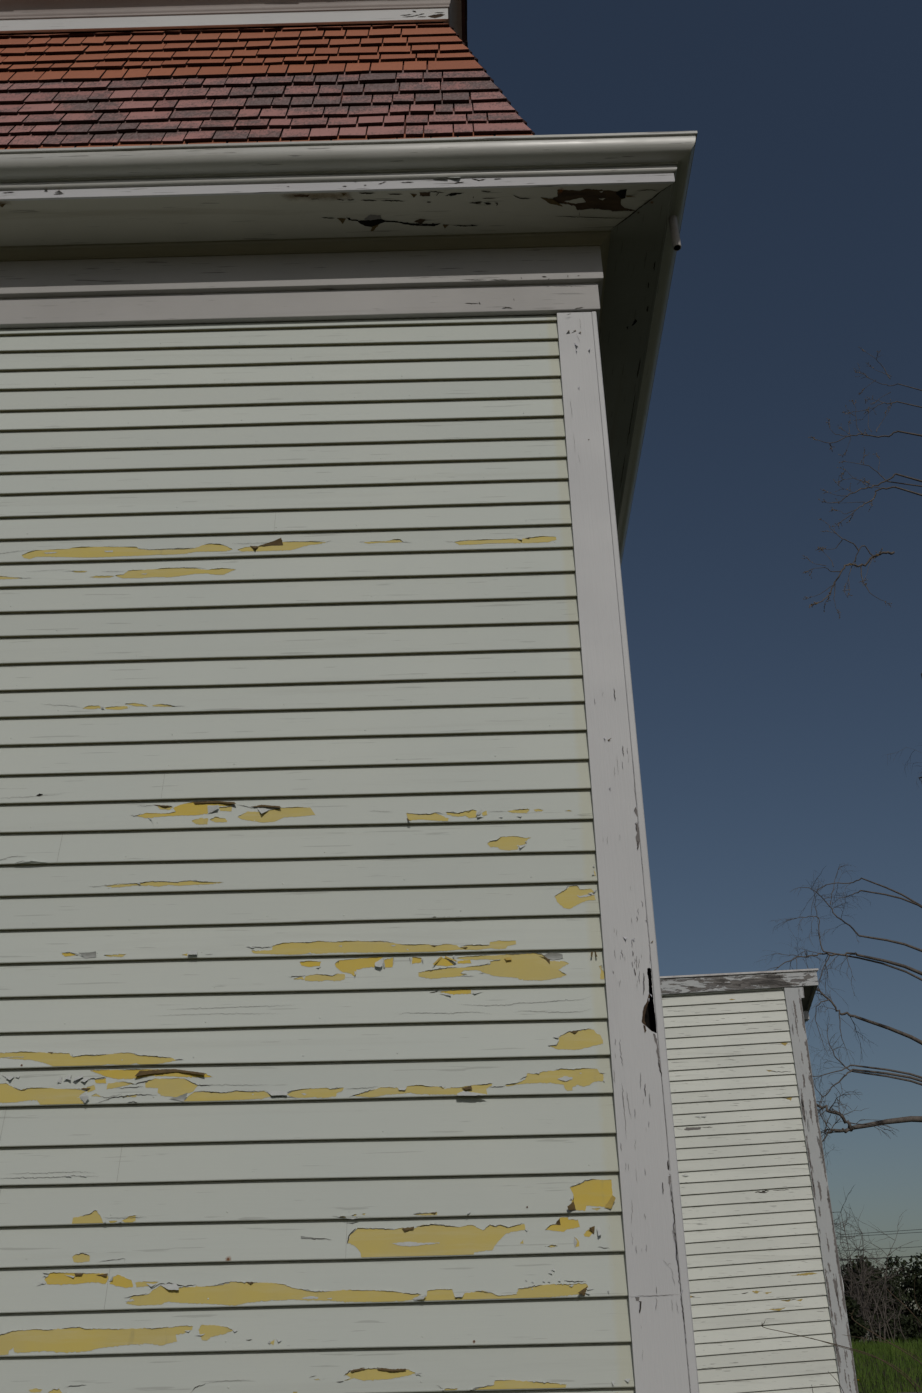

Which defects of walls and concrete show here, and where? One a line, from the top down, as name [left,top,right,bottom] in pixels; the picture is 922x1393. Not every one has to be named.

peeling [0,538,328,580]
peeling [135,801,315,825]
peeling [406,809,543,821]
peeling [250,940,569,996]
peeling [548,1028,603,1050]
peeling [0,1051,605,1105]
peeling [650,974,858,1393]
peeling [336,1212,528,1257]
peeling [545,1179,616,1248]
peeling [37,1253,592,1306]
peeling [0,1324,290,1355]
peeling [340,1367,422,1382]